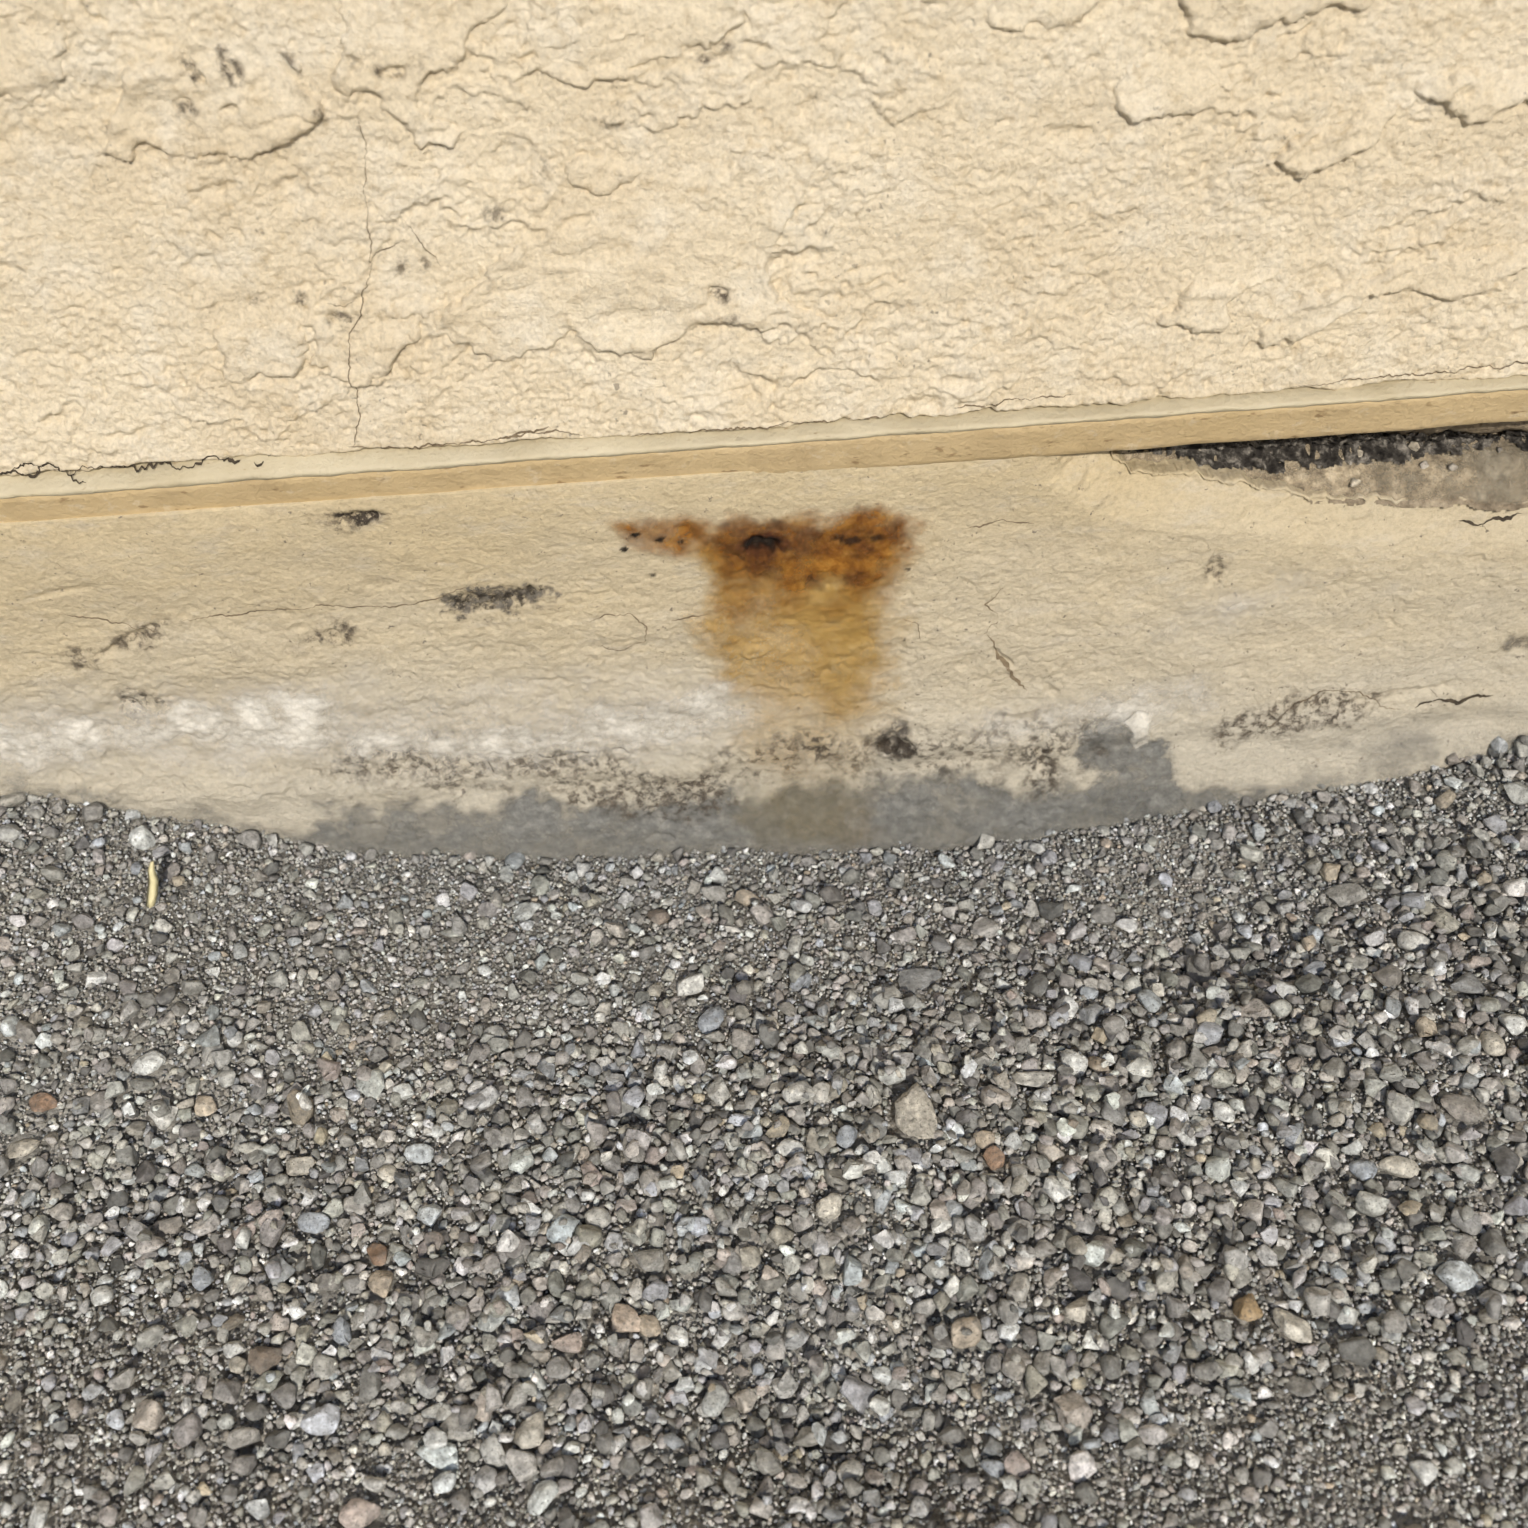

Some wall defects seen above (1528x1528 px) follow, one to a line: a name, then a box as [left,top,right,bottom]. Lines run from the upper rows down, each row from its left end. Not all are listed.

spalling [1111,421,1528,512]
peeling [441,584,561,621]
rust [618,509,910,696]
damp [984,692,1165,734]
damp [300,769,1265,862]